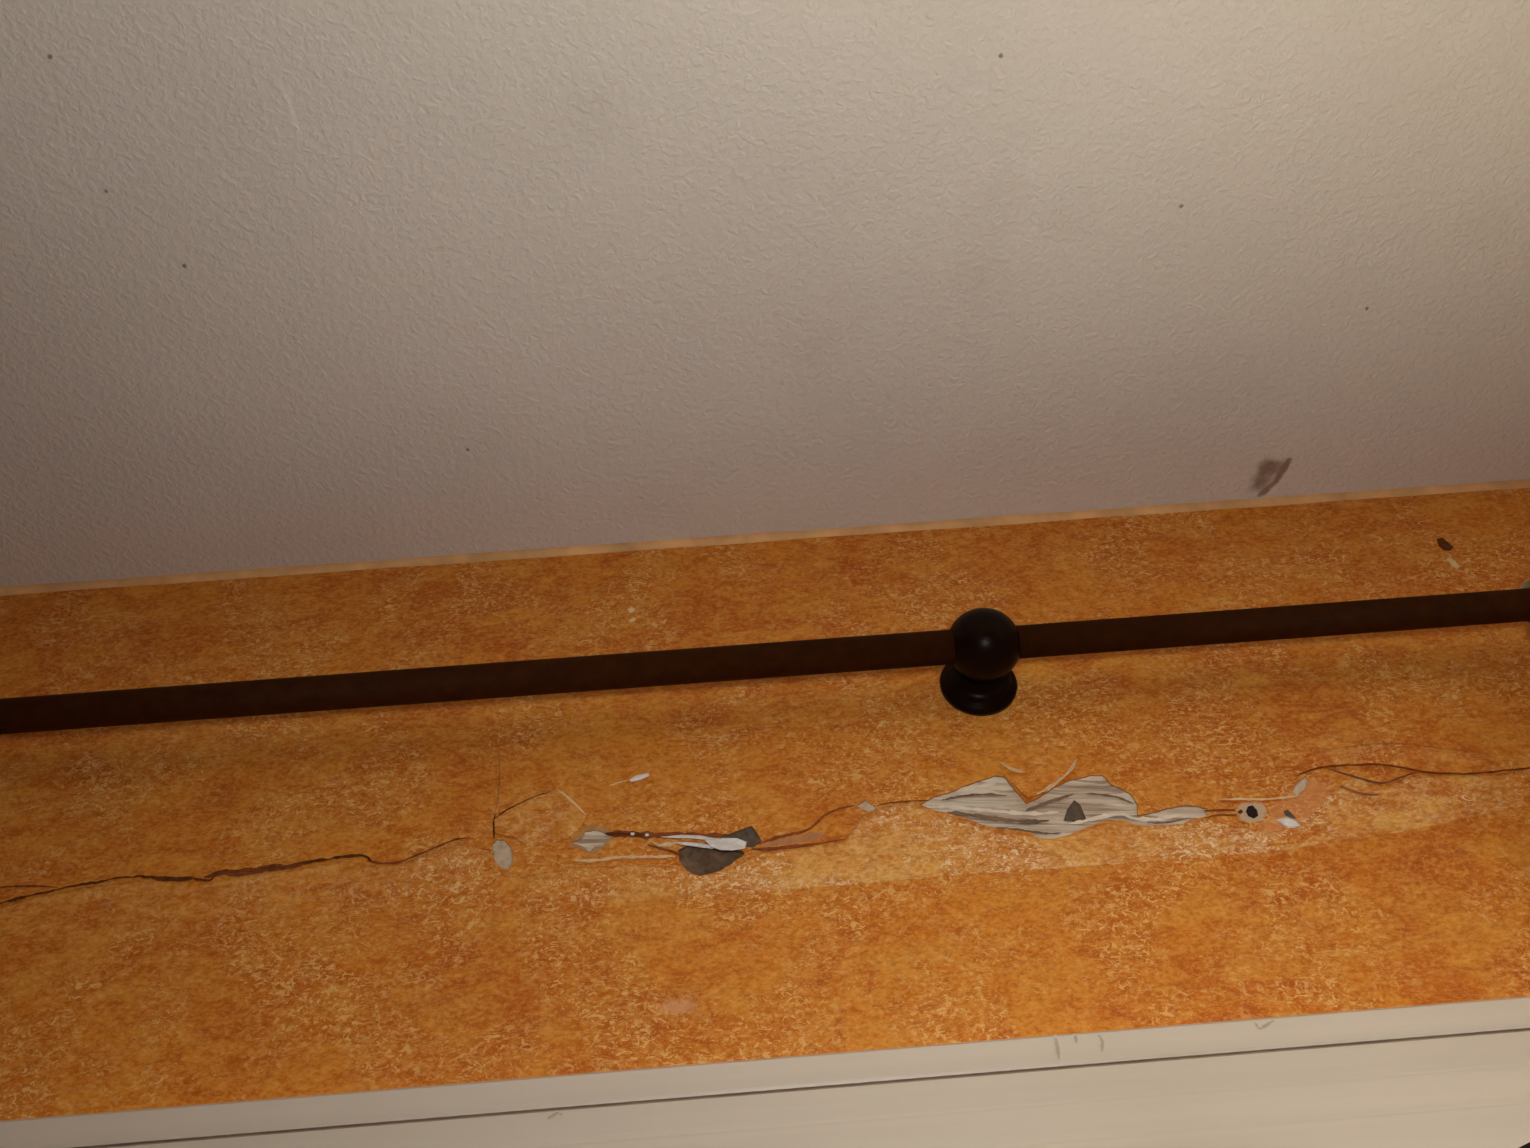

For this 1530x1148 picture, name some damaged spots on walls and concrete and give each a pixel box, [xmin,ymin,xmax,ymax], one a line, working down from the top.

crack [0,837,470,904]
spalling [663,826,762,876]
crack [573,800,929,863]
peeling [920,758,1338,845]
crack [1297,763,1530,796]